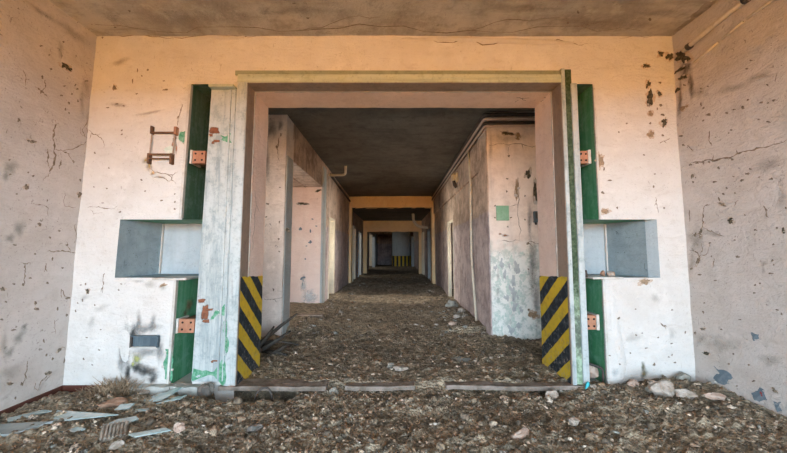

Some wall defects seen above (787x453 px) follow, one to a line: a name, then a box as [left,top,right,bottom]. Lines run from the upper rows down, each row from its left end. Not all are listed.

crack [245,16,651,46]
spalling [657,49,694,93]
spalling [645,79,668,139]
crack [43,120,105,180]
crack [660,131,786,163]
rust [184,299,213,323]
leakage [120,357,156,383]
peeling [713,353,738,387]
peeling [751,380,782,412]